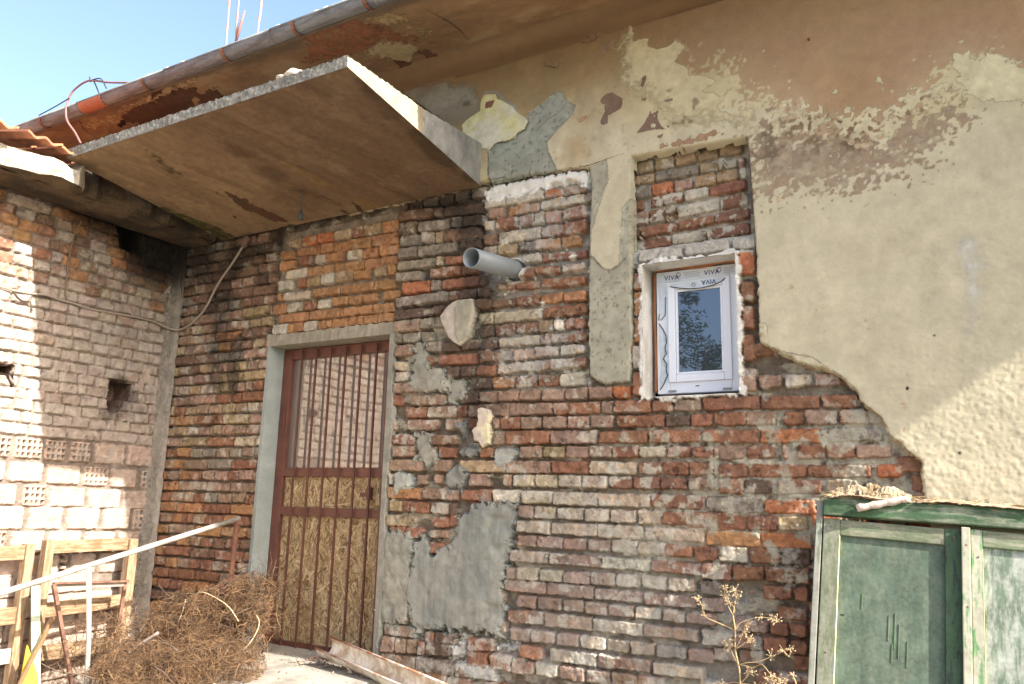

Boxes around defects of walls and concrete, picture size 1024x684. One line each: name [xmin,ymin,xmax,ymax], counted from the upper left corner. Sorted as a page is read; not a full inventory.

flaking render [77,77,223,130]
flaking render [462,92,586,185]
peeling [601,25,1024,210]
flaking render [588,160,637,386]
flaking render [759,323,923,475]